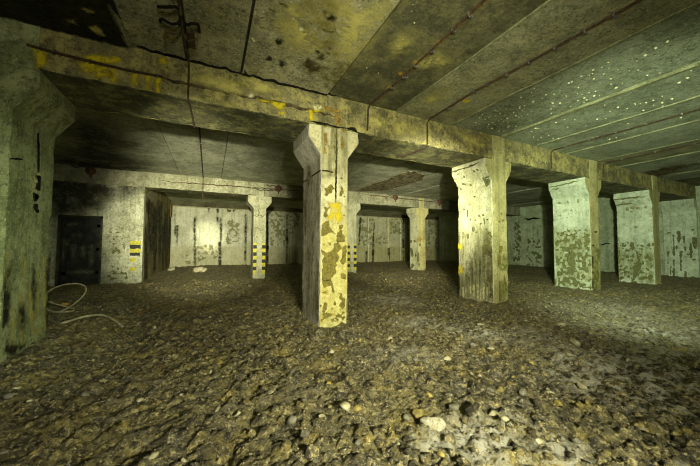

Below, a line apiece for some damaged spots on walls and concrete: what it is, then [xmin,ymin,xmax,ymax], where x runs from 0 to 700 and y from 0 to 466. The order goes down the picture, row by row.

leakage [275,0,381,87]
leakage [192,75,281,97]
crack [136,45,346,202]
spalling [33,175,41,213]
peeling [324,177,345,197]
spalling [356,171,425,191]
peeling [320,207,347,322]
peeling [555,229,597,290]
peeling [619,241,654,283]